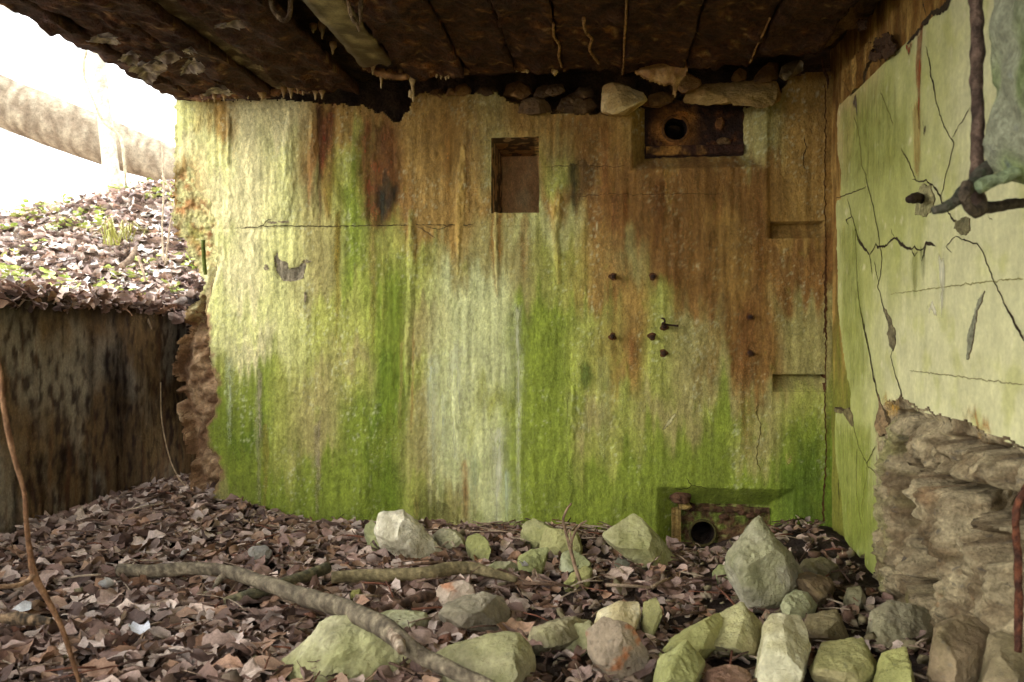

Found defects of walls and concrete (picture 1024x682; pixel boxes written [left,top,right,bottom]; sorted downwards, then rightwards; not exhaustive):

peeling [842,19,897,95]
corrosion [906,30,922,123]
corrosion [358,122,398,226]
peeling [263,252,311,282]
crack [242,219,472,239]
crack [803,0,1024,524]
spalling [170,166,221,491]
spalling [966,291,985,360]
spalling [871,394,1024,641]